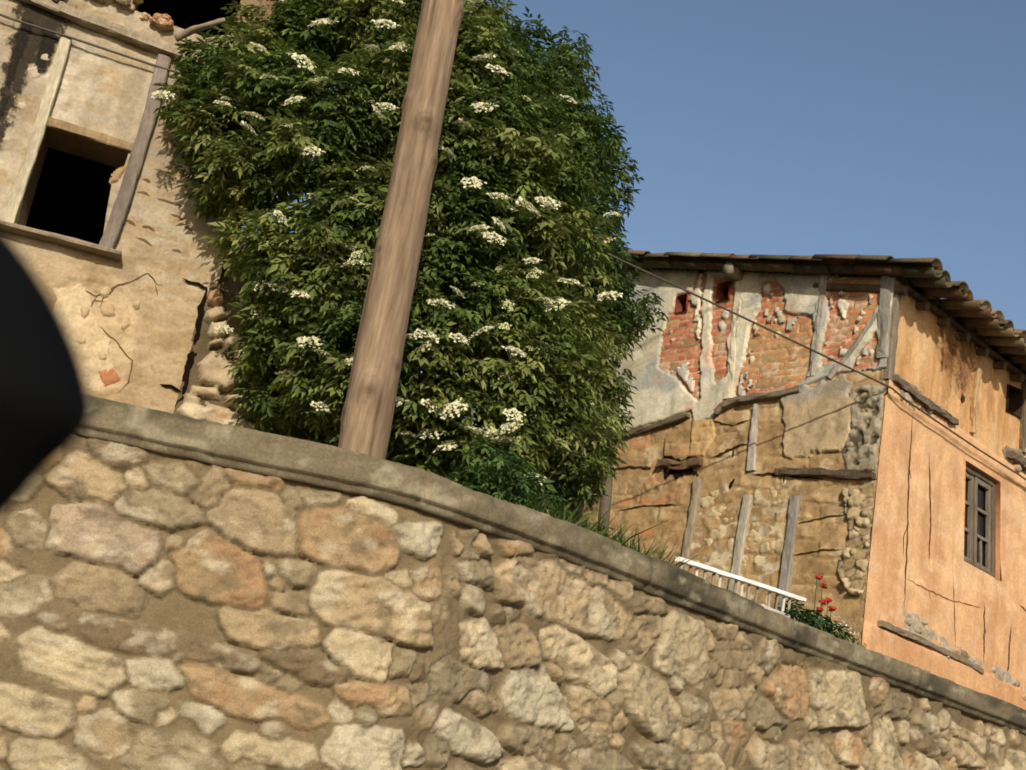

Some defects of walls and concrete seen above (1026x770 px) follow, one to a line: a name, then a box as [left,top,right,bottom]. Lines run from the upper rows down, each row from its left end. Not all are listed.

water stain [0,0,77,149]
crack [84,273,208,406]
flaking render [659,272,948,470]
peeling [690,490,785,570]
spalling [837,483,874,595]
crack [903,415,1026,671]
spalling [902,606,1026,700]